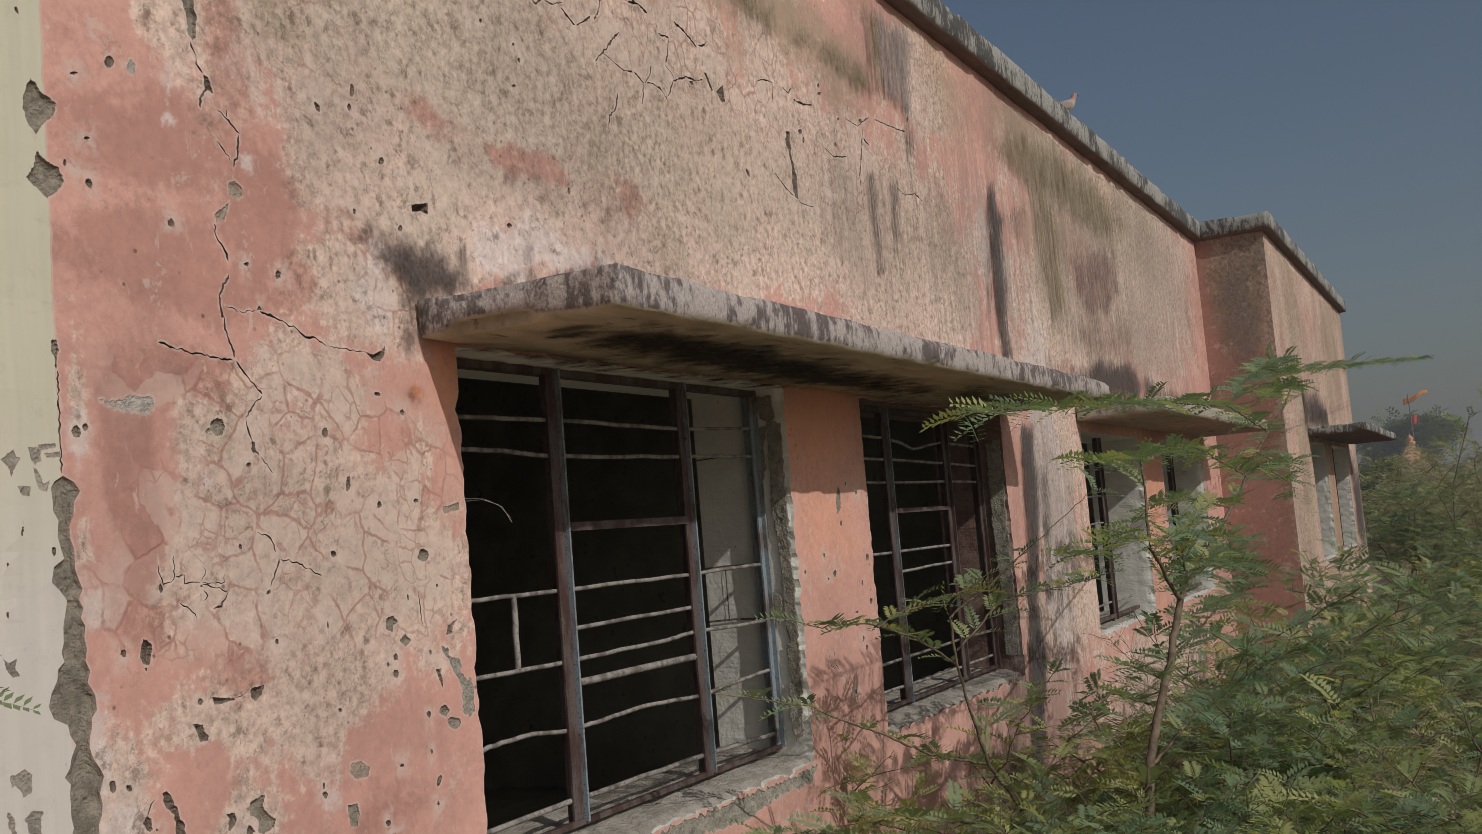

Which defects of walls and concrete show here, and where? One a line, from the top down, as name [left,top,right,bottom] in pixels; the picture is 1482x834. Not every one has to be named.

crack [532,0,706,134]
spalling [22,78,67,198]
crack [159,42,363,472]
damp [989,183,1019,359]
damp [515,324,940,406]
spalling [1,443,132,834]
crack [158,556,228,618]
crack [258,532,321,594]
peeling [756,395,806,741]
damp [958,386,1053,834]
spalling [143,791,186,834]
spalling [226,795,276,834]